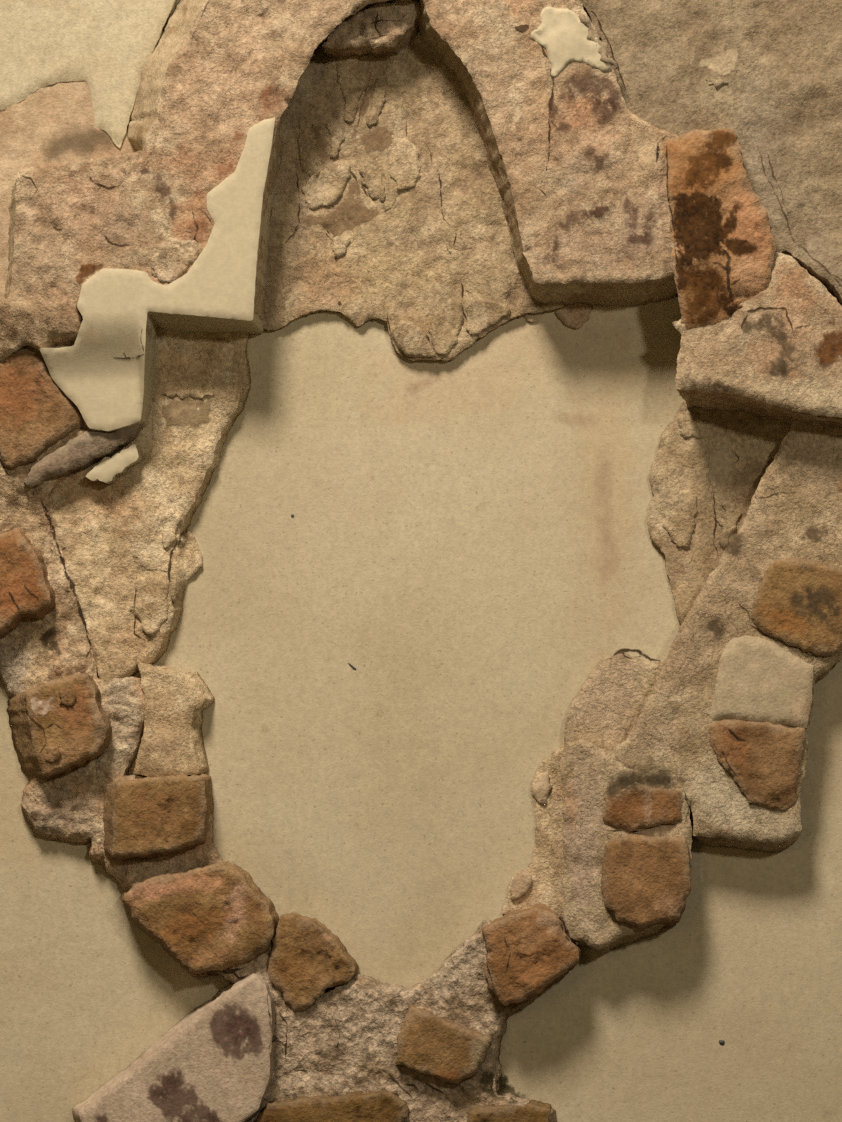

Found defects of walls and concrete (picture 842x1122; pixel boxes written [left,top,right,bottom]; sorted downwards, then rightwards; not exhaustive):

spalling [531,6,617,77]
spalling [699,48,738,89]
spalling [298,54,421,258]
rust [672,130,757,325]
spalling [150,237,203,283]
peeling [392,292,541,358]
spalling [162,389,213,426]
crack [8,585,39,611]
crack [35,488,91,657]
spalling [30,689,76,716]
leakage [210,1002,262,1058]
leakage [149,1068,220,1122]